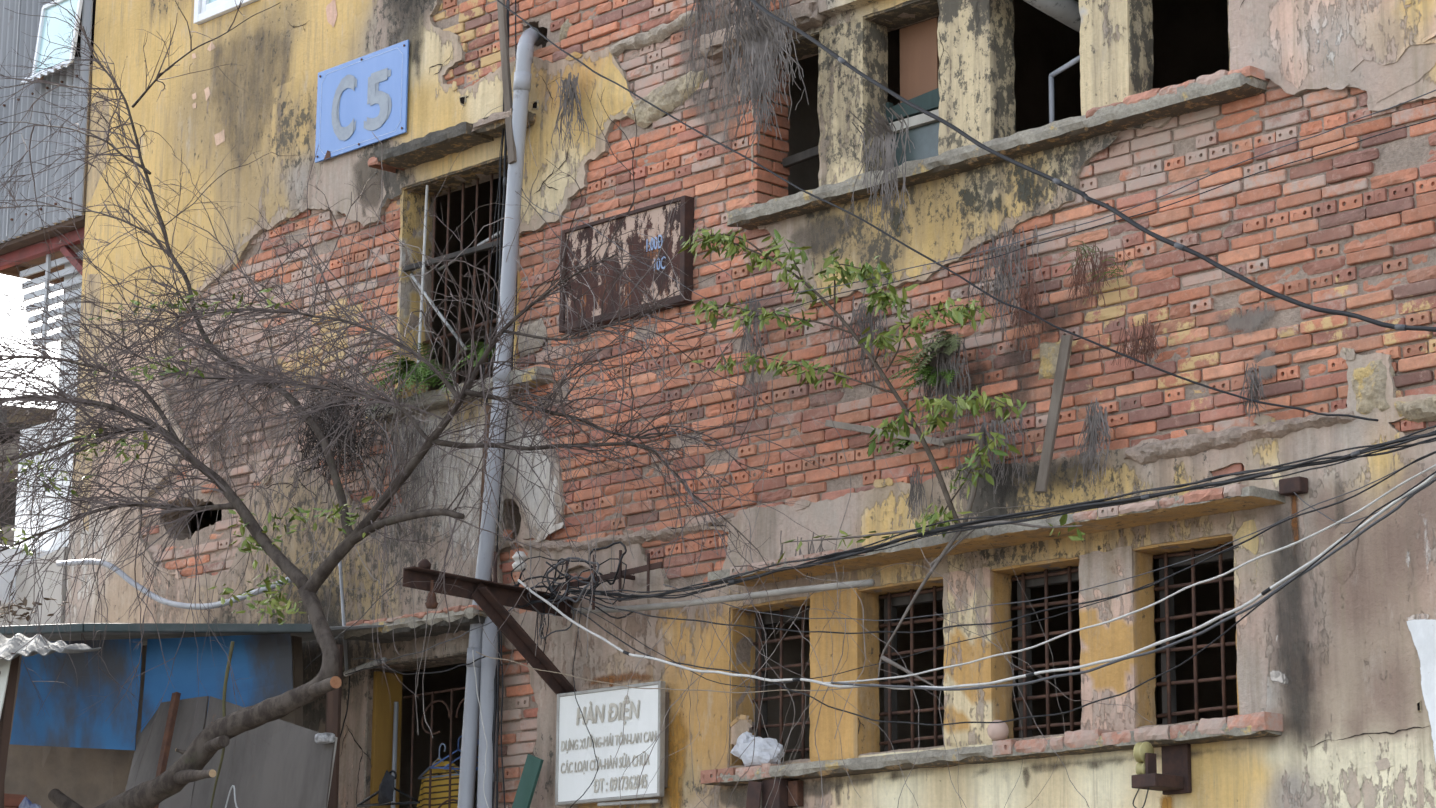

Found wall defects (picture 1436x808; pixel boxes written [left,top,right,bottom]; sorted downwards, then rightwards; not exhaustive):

flaking render [214,129,225,146]
mould [890,207,903,237]
mould [958,152,1065,224]
flaking render [433,0,1436,591]
damp [1270,517,1309,736]